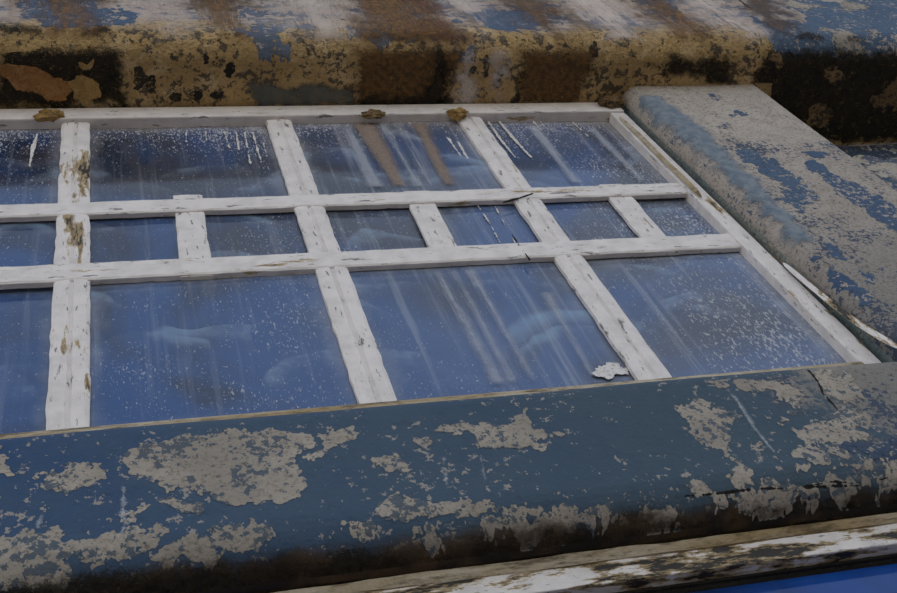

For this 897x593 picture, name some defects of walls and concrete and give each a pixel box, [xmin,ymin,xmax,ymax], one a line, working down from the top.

damp [0,48,156,109]
damp [248,50,454,106]
mould [663,52,733,84]
damp [753,50,897,143]
peeling [639,95,897,308]
crack [807,370,838,410]
peeling [370,453,413,473]
peeling [413,407,565,452]
peeling [674,369,897,521]
peeling [0,425,359,593]
peeling [341,491,627,558]
damp [0,549,403,593]